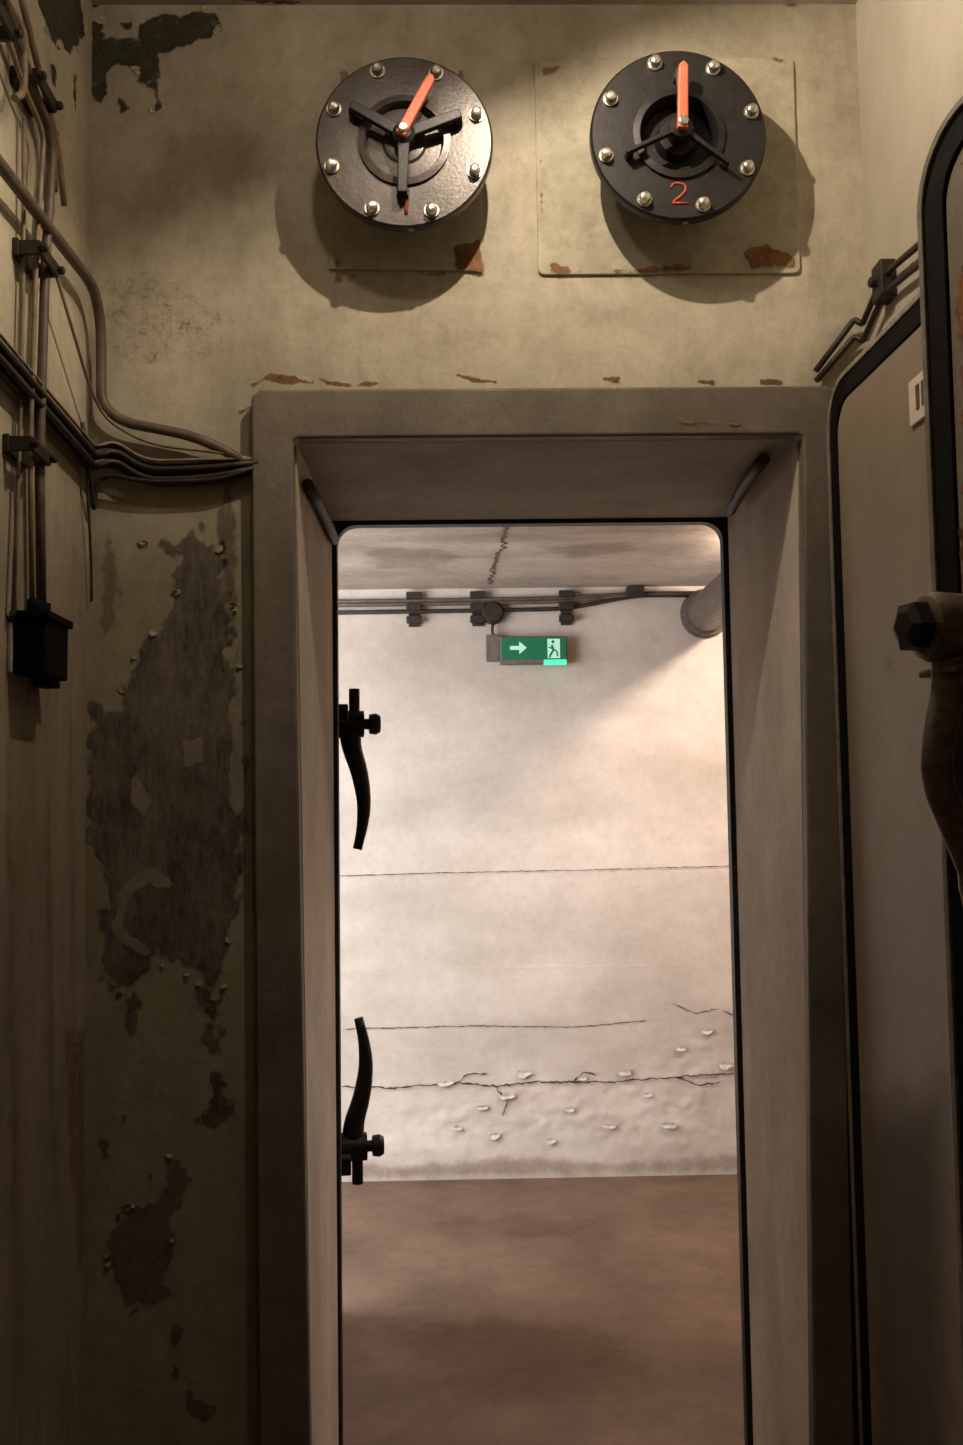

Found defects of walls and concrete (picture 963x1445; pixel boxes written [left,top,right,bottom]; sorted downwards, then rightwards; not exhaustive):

peeling [38,0,226,113]
peeling [86,487,253,1053]
peeling [195,1072,235,1127]
peeling [100,1151,192,1310]